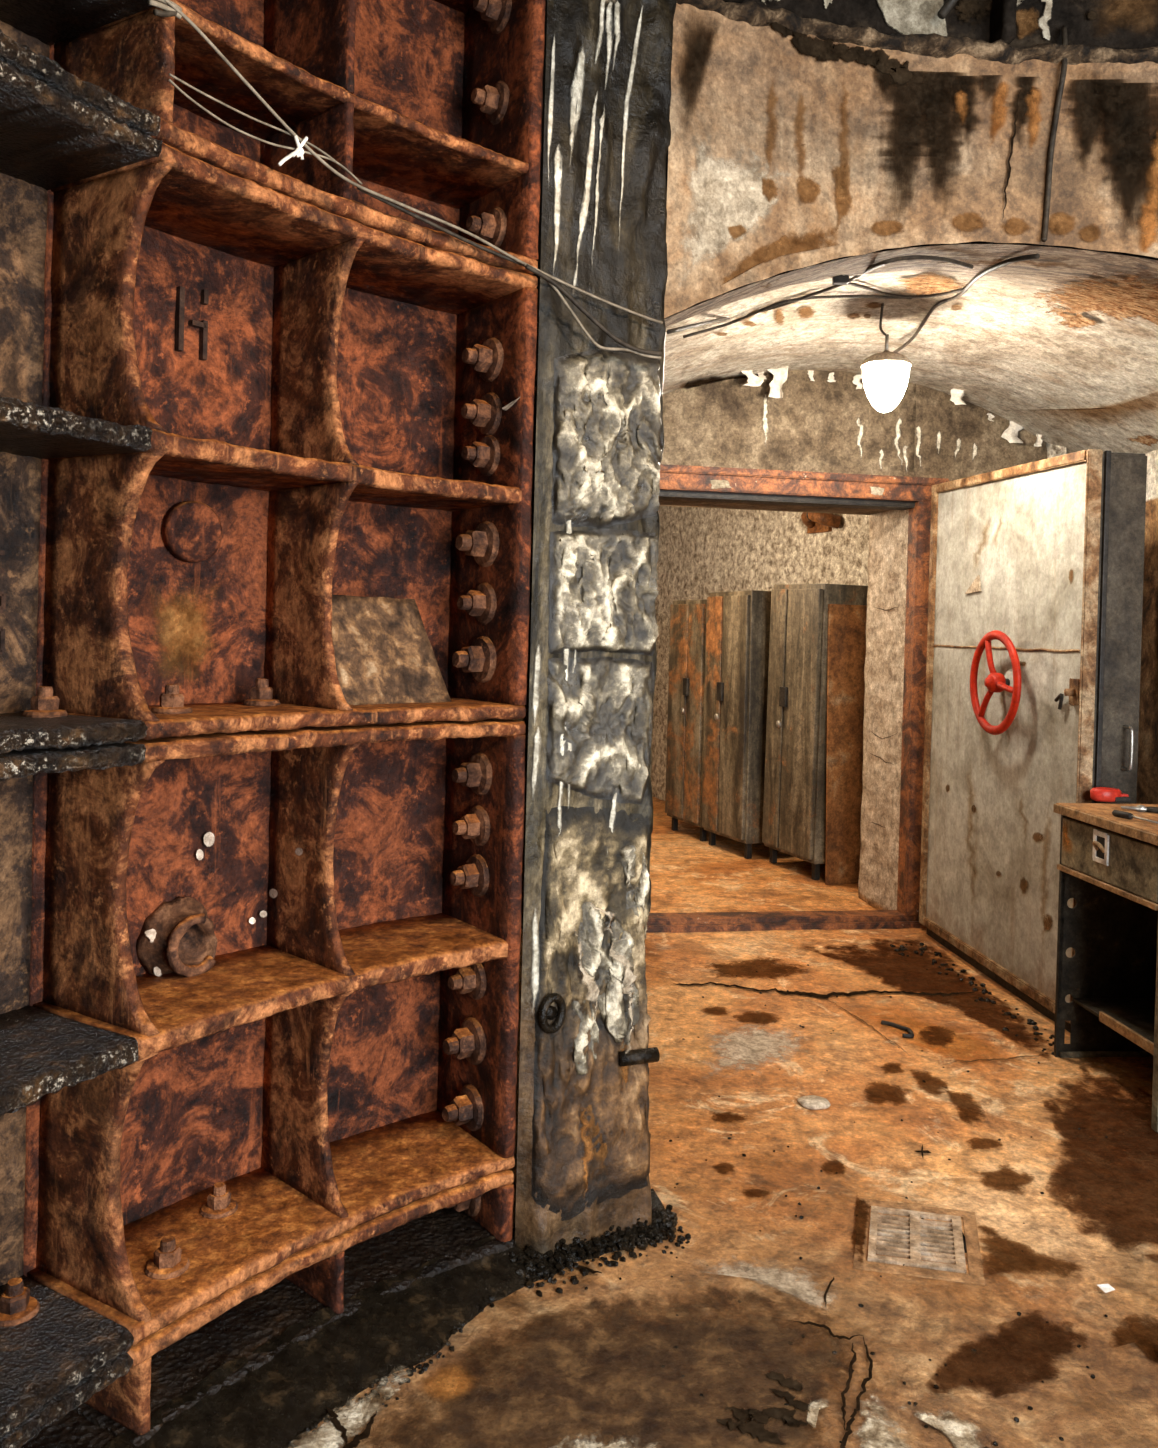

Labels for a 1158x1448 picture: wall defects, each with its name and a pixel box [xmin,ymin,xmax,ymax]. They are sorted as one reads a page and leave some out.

flaking render [878,0,947,36]
flaking render [1016,0,1052,40]
damp [548,0,642,286]
damp [877,71,997,192]
damp [1072,79,1149,211]
damp [714,958,804,978]
crack [673,982,975,1049]
damp [809,940,1047,1057]
damp [982,1068,1158,1260]
damp [980,1226,1076,1274]
crack [795,1277,873,1448]
damp [929,1314,1086,1396]